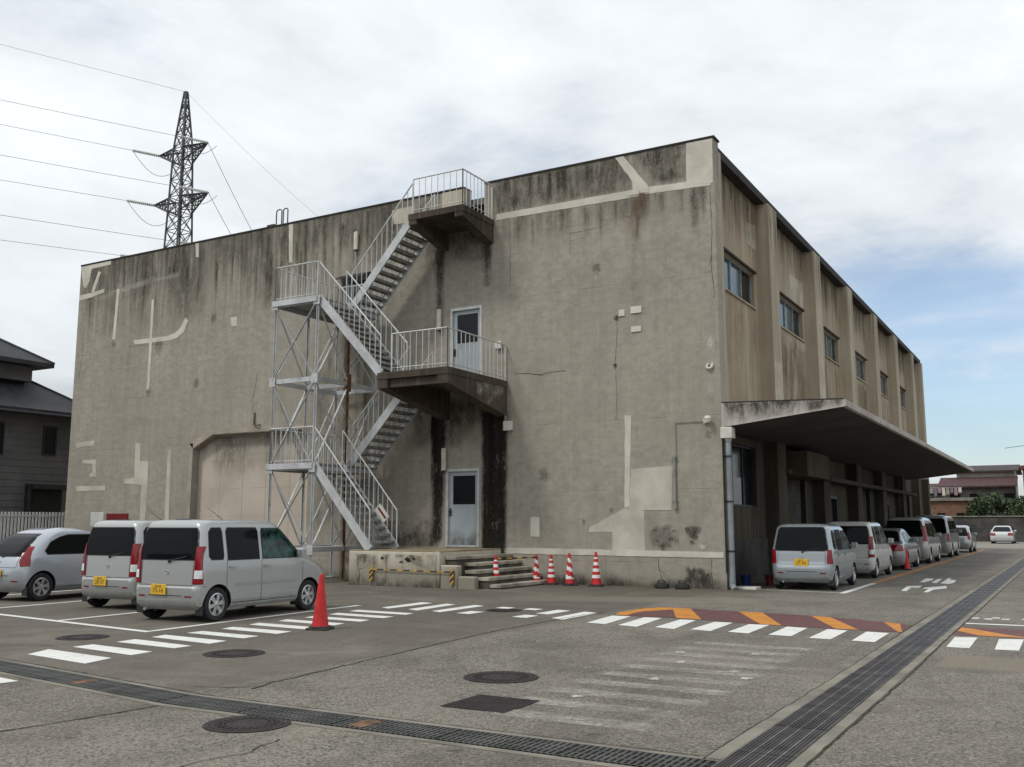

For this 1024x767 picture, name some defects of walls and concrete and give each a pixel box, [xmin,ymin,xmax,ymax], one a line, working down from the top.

damp [372,204,397,244]
damp [498,159,621,229]
damp [380,401,507,563]